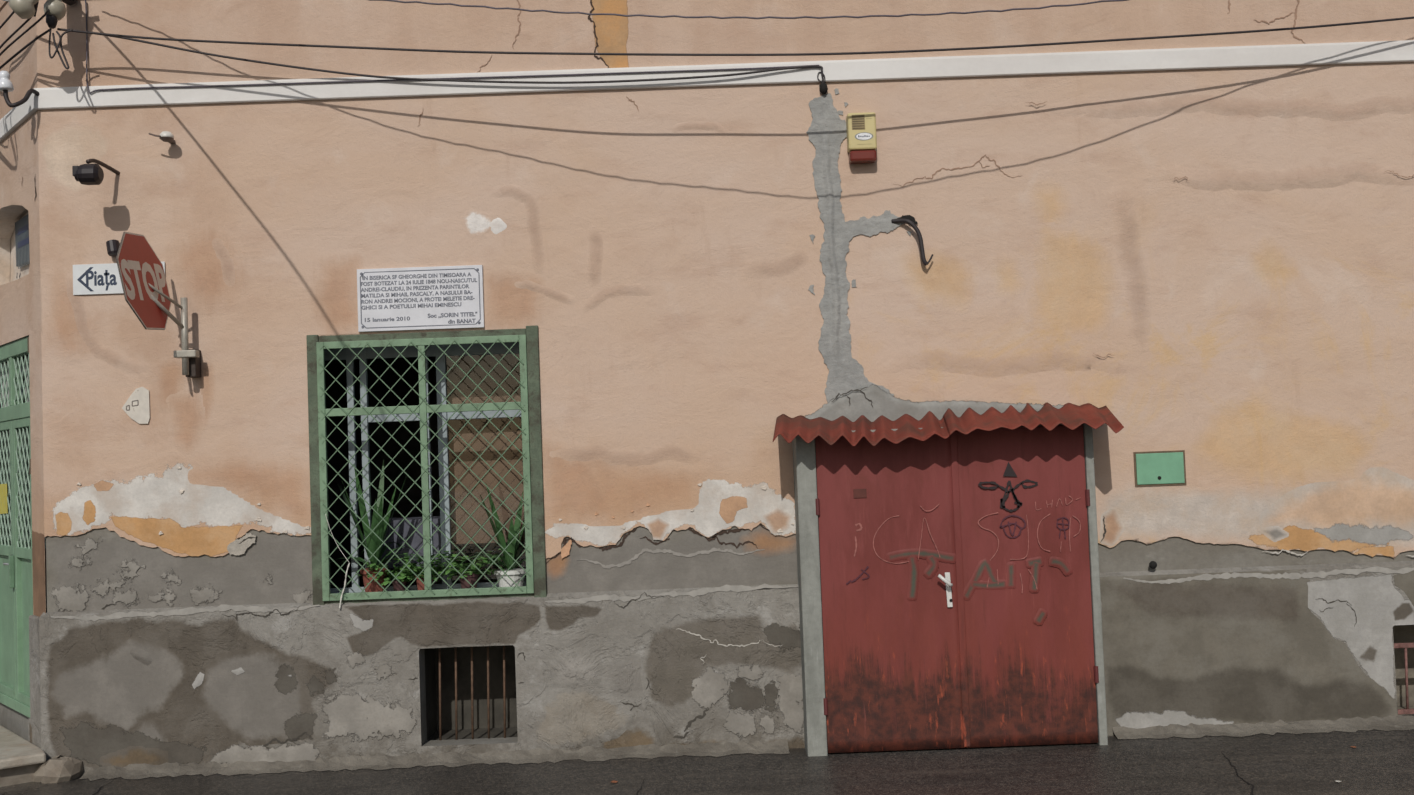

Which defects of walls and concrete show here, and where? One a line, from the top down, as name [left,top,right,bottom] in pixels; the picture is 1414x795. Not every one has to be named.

crack [588,0,609,67]
crack [894,154,1022,187]
flaking render [32,463,319,621]
flaking render [545,479,798,604]
peeling [1096,462,1414,584]
flaking render [210,650,417,764]
flaking render [691,665,804,741]